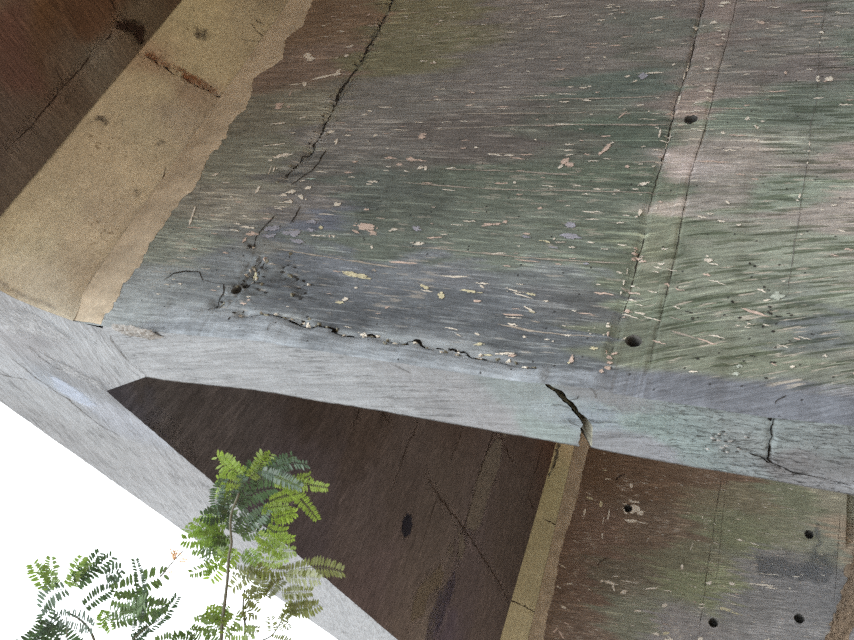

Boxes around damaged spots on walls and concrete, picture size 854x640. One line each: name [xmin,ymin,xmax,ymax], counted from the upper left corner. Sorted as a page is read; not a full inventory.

crack [4,0,118,152]
crack [138,53,221,97]
rust [177,67,213,90]
crack [285,0,394,184]
crack [246,315,597,446]
crack [750,395,850,486]
water stain [402,513,413,538]